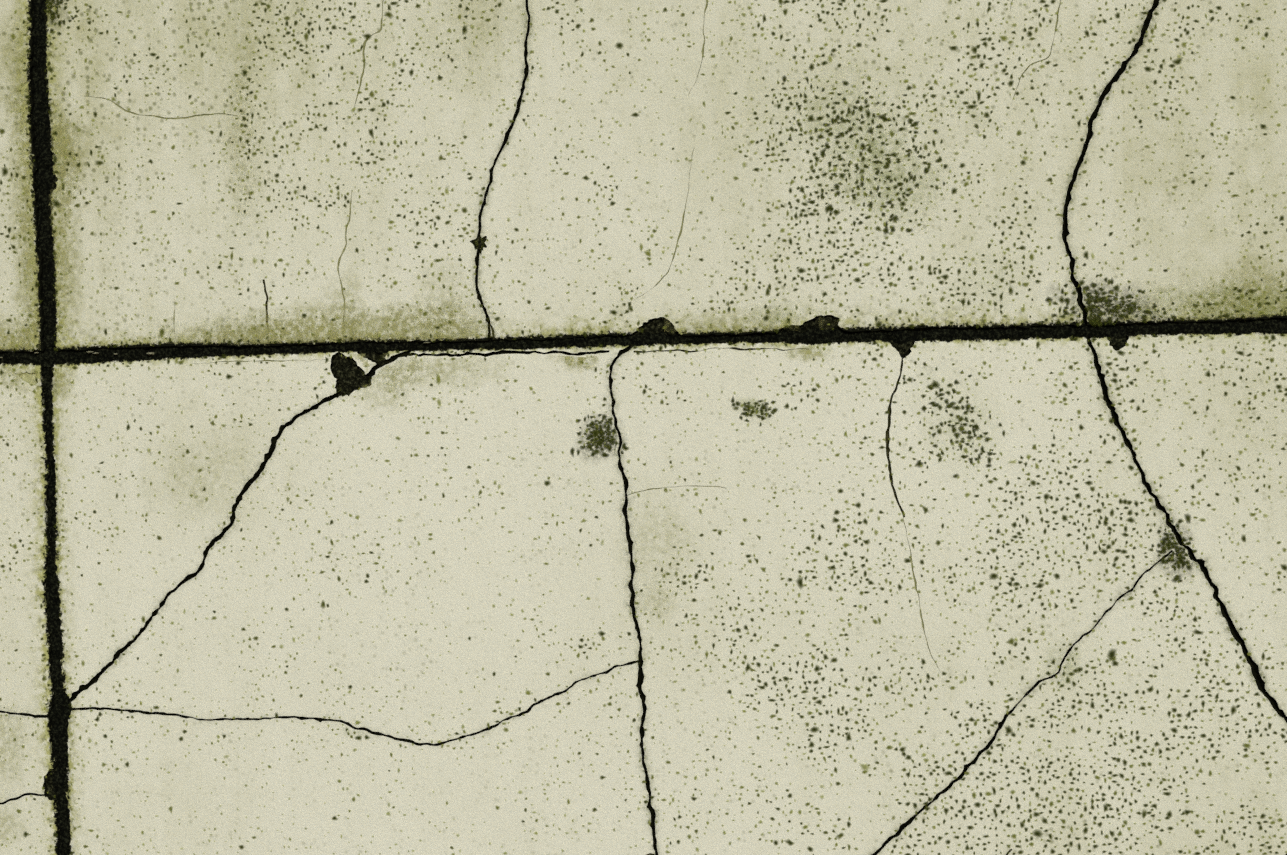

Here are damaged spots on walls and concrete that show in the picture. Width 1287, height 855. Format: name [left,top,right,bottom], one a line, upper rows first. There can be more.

crack [0,0,808,855]
crack [871,0,1287,855]